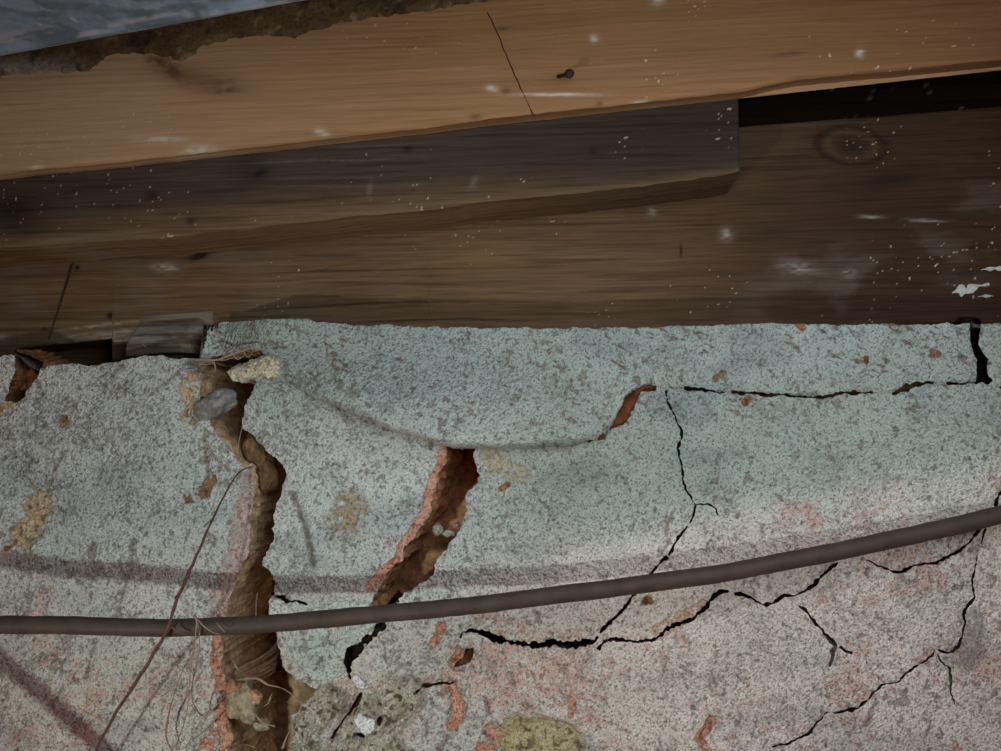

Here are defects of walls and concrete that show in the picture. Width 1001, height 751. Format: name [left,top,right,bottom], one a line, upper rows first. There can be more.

crack [199,349,317,751]
rust [327,494,367,532]
crack [343,446,480,679]
spalling [587,385,657,443]
crack [460,491,1001,748]
crack [649,316,1001,574]